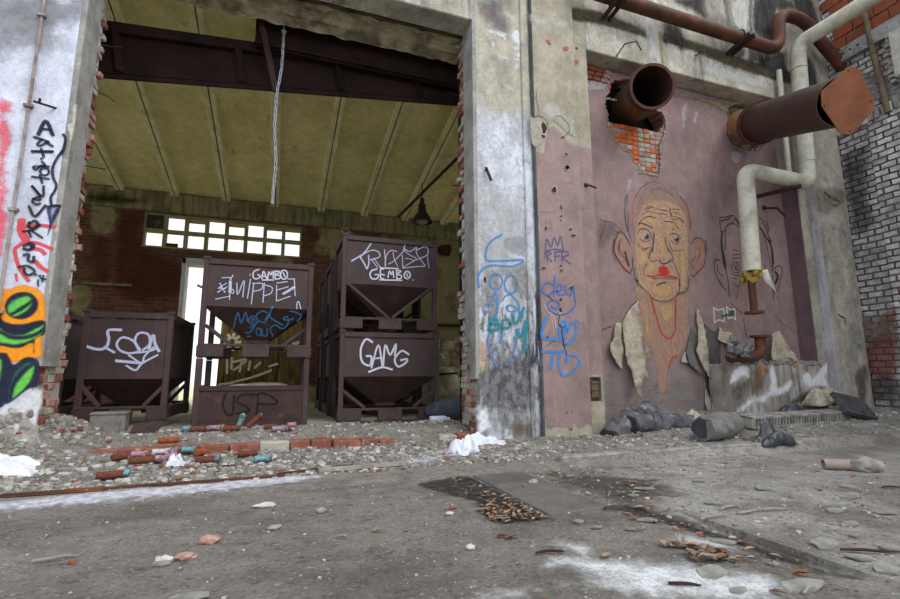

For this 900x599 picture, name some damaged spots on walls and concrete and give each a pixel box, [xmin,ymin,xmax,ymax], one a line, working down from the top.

damp [675,0,705,17]
damp [731,0,819,34]
damp [637,15,686,63]
damp [704,64,767,87]
damp [807,56,817,86]
flaking render [67,104,77,147]
flaking render [574,60,667,176]
flaking render [49,215,60,294]
peeling [610,301,651,398]
peeling [681,309,734,411]
flaking render [866,337,895,379]
efflorescence [477,407,492,434]